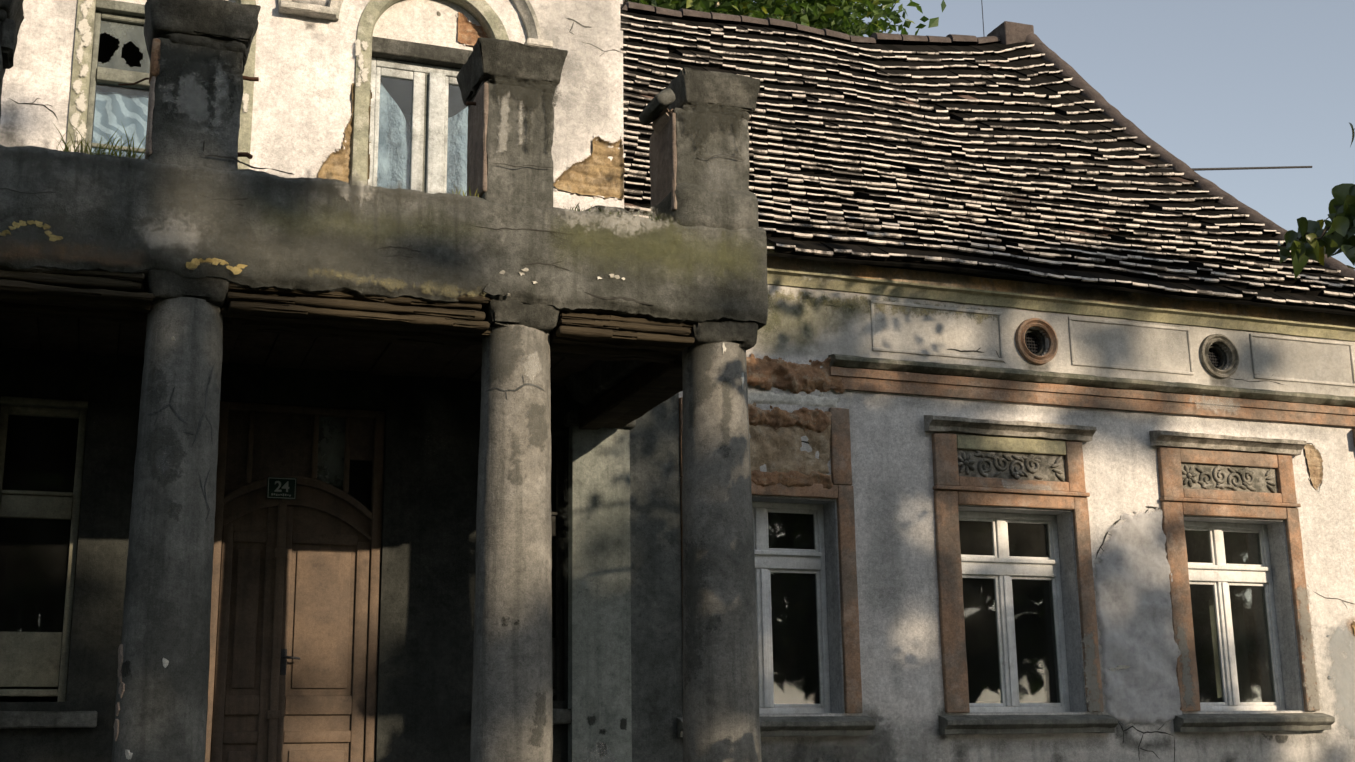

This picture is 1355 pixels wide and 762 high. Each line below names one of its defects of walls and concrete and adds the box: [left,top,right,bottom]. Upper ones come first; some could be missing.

spalling [437,11,489,46]
spalling [318,38,372,185]
spalling [553,135,626,201]
spalling [649,113,677,211]
spalling [741,353,845,489]
spalling [1304,444,1324,490]
spalling [114,644,133,760]
crack [1118,722,1175,762]